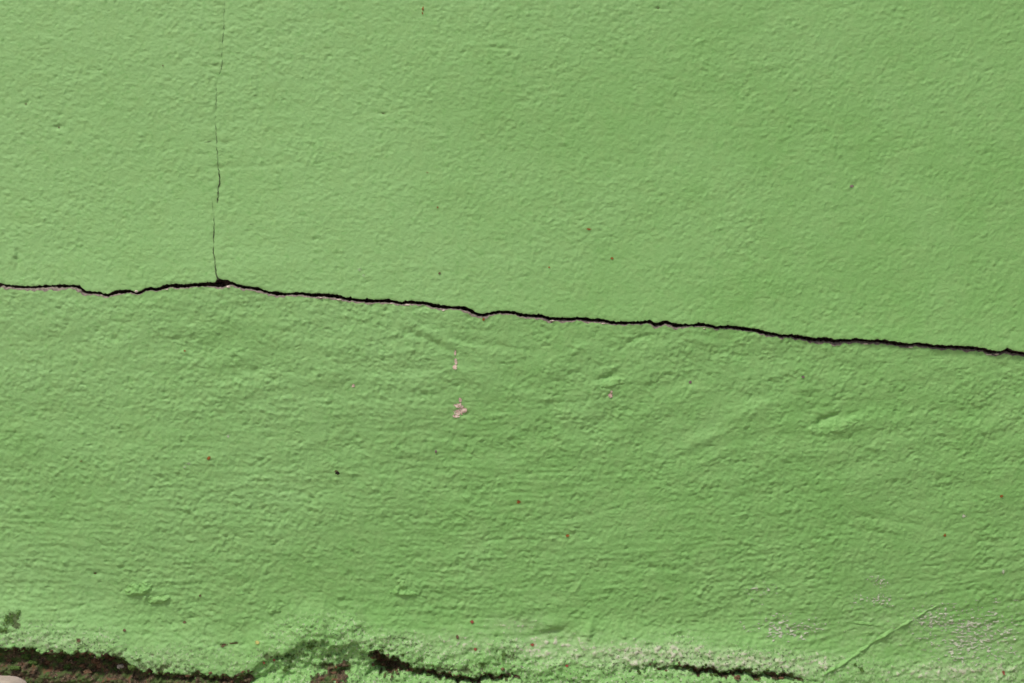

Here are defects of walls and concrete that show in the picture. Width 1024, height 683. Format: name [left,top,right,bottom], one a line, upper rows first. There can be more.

crack [0,136,1024,357]
peeling [452,398,467,418]
spalling [0,644,255,683]
spalling [310,660,351,683]
spalling [368,644,520,683]
spalling [637,661,804,682]